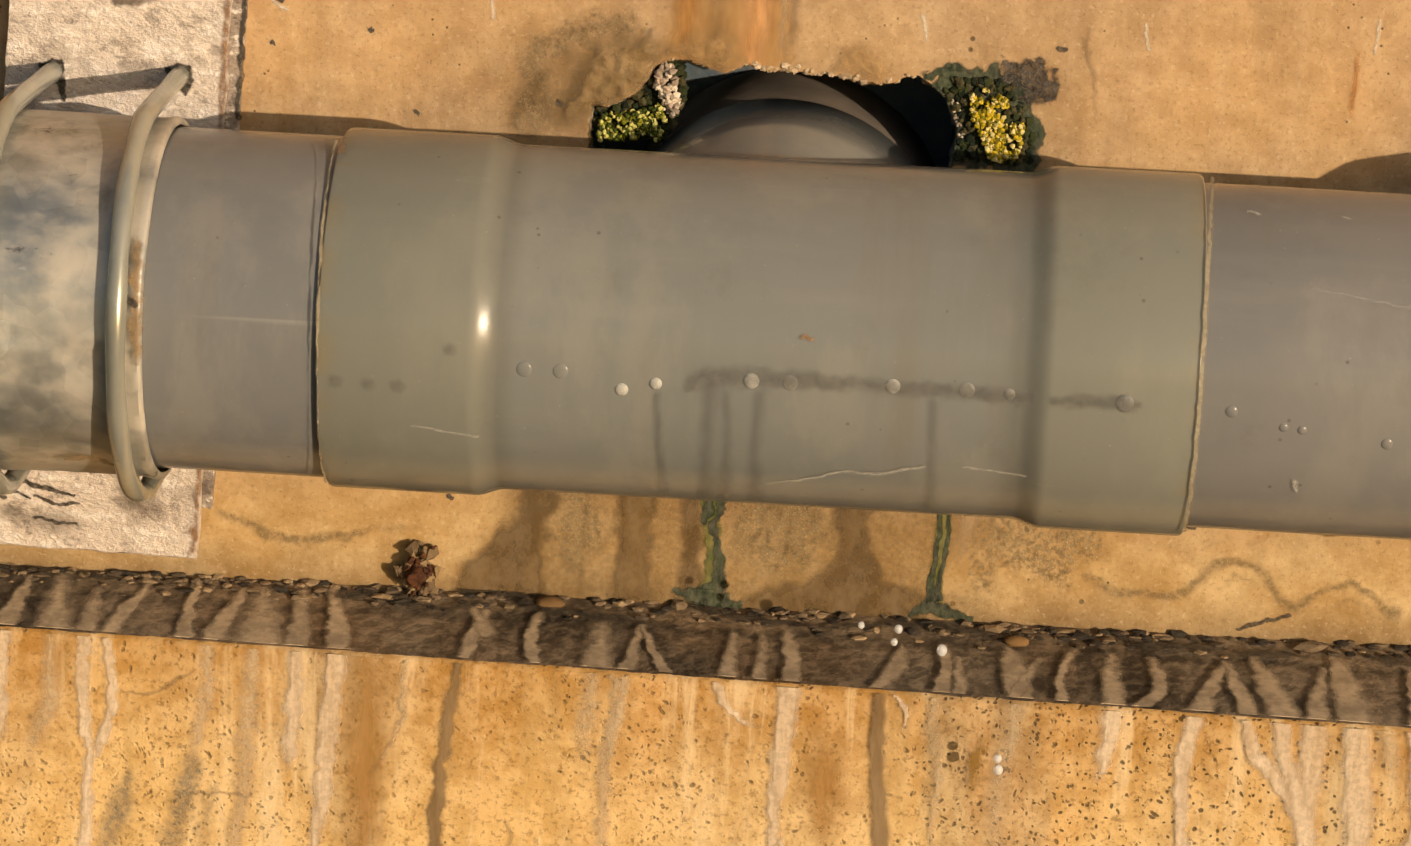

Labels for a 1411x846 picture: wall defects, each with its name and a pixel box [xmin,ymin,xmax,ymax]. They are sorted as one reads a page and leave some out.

spalling [652,51,706,118]
corrosion [669,0,791,70]
spalling [743,61,917,86]
spalling [951,99,965,140]
damp [675,500,728,608]
damp [35,574,152,846]
damp [174,579,350,846]
damp [427,490,558,846]
damp [713,632,801,846]
damp [869,646,909,846]
damp [1096,654,1167,774]
damp [1173,658,1411,846]